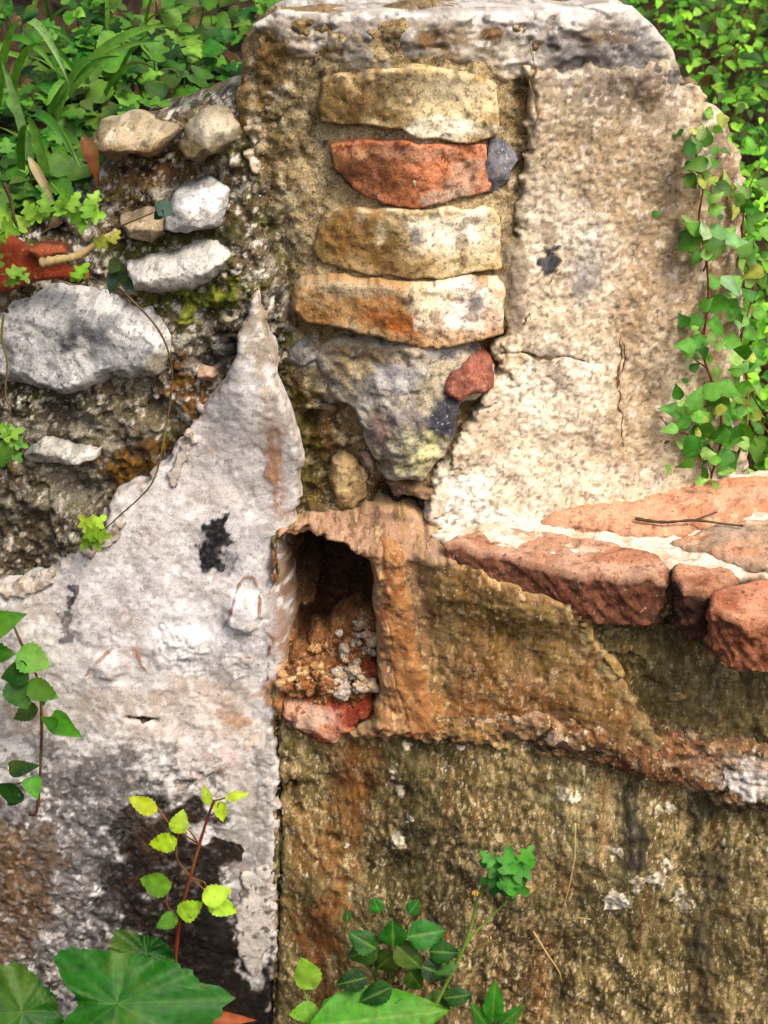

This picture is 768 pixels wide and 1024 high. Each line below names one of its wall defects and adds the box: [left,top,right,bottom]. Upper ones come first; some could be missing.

crack [501,351,586,362]
crack [617,338,626,447]
leakage [194,513,235,573]
spalling [154,525,382,745]
leakage [0,749,278,1024]